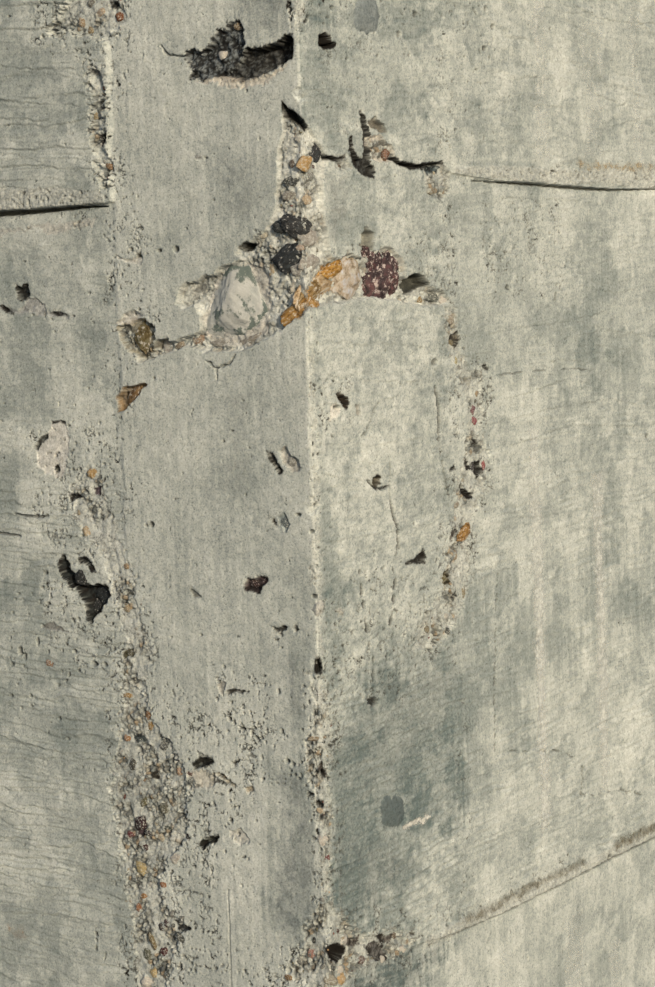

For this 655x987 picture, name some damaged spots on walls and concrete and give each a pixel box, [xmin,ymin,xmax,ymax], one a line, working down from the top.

spalling [184,19,294,90]
spalling [115,102,451,364]
peeling [79,557,96,572]